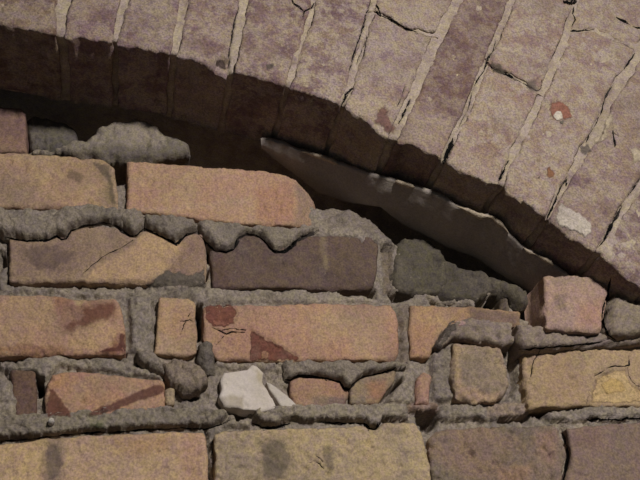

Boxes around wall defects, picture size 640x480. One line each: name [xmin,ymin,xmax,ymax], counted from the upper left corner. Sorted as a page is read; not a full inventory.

crack [349,2,416,71]
crack [460,41,543,124]
crack [442,138,454,164]
crack [6,222,319,274]
crack [214,328,245,345]